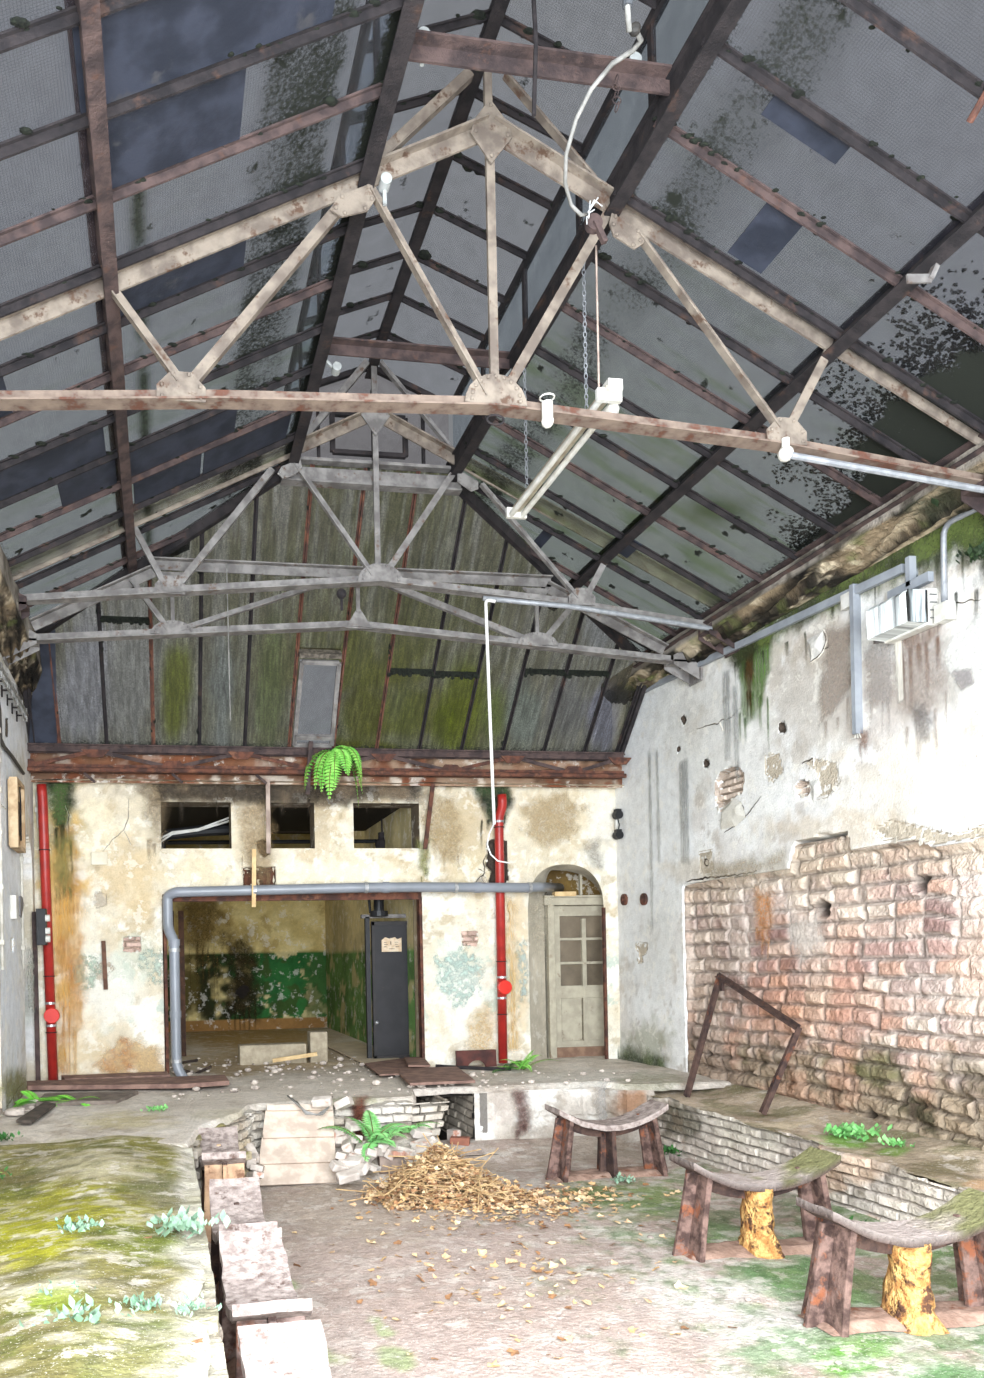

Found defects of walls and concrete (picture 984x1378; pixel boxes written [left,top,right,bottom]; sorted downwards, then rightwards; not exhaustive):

damp [723,663,769,739]
damp [820,629,851,716]
damp [865,591,984,734]
spalling [714,767,745,812]
peeling [765,752,783,783]
peeling [795,758,840,800]
damp [55,824,77,1072]
flaking render [684,819,984,1151]